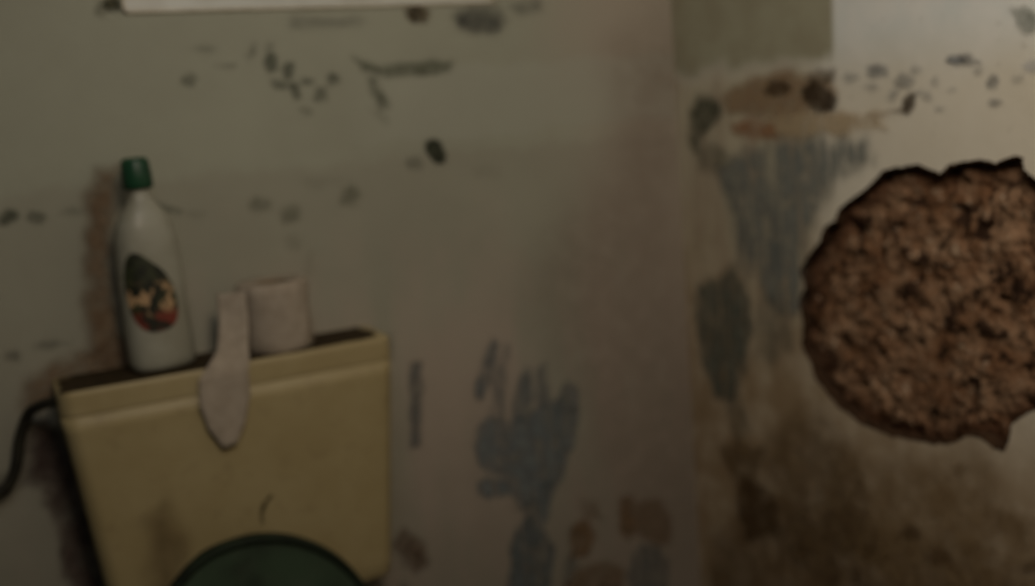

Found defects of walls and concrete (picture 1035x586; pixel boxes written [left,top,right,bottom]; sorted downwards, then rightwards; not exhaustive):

peeling [265,53,308,97]
peeling [724,73,859,137]
flaking render [425,139,446,164]
flaking render [798,156,1035,451]